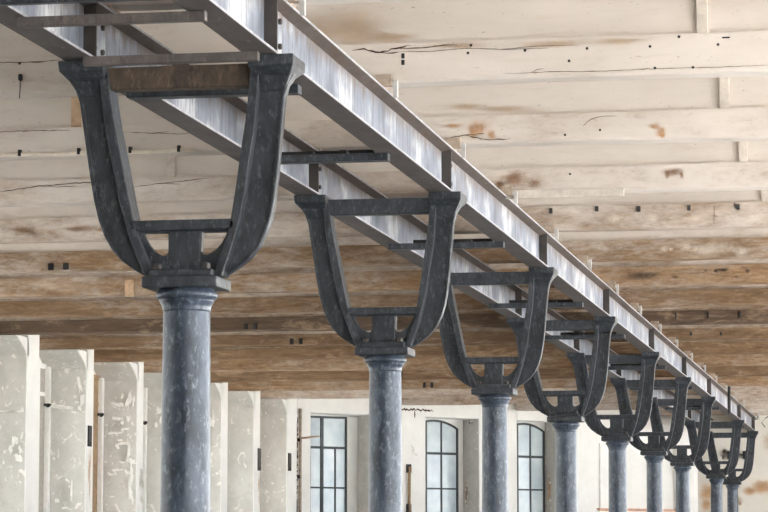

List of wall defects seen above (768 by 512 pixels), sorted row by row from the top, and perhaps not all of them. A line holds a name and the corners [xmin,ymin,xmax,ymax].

crack [352,44,565,54]
crack [530,66,674,74]
rust [442,118,496,140]
crack [451,132,506,140]